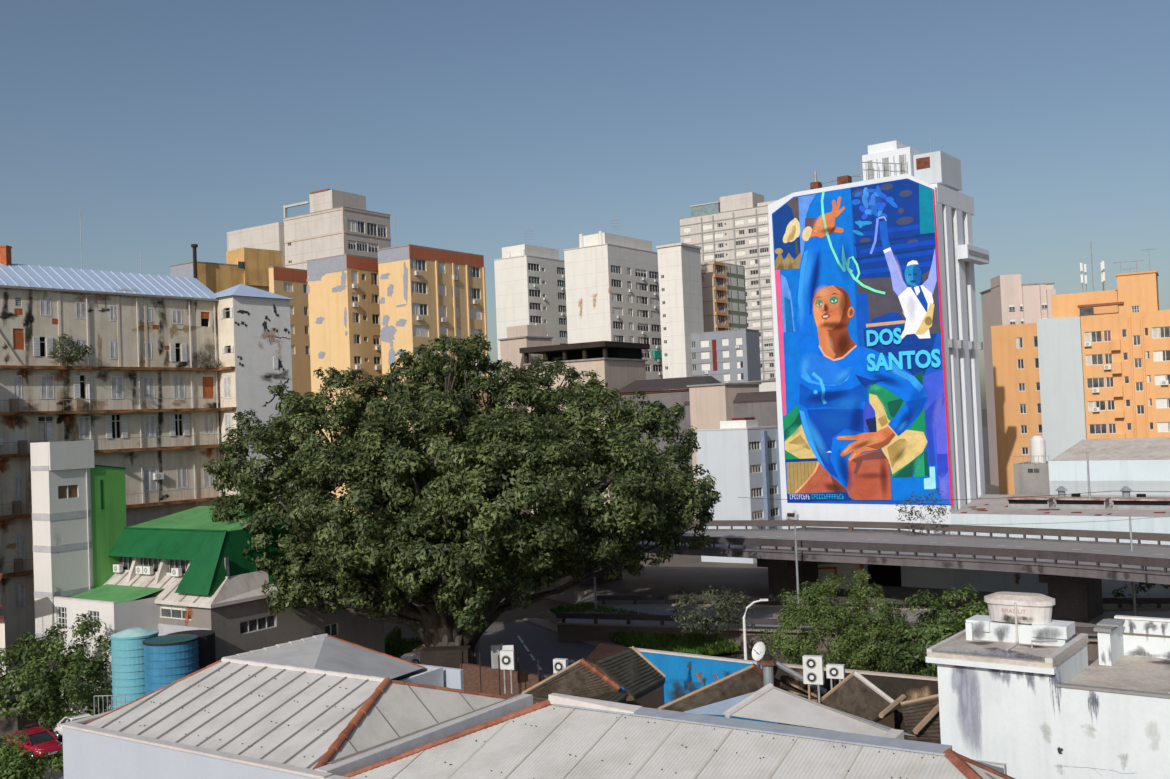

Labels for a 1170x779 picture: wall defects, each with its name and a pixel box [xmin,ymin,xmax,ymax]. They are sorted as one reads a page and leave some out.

leakage [0,295,34,372]
flaking render [259,304,290,371]
peeling [332,271,346,292]
peeling [380,261,408,366]
leakage [157,373,168,502]
leakage [941,616,1061,745]